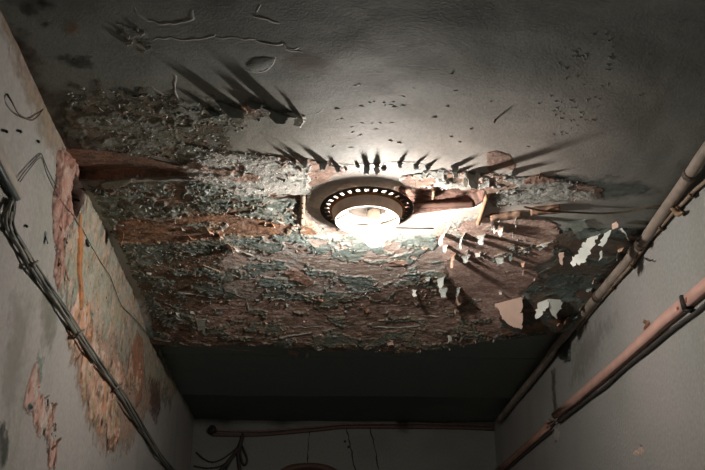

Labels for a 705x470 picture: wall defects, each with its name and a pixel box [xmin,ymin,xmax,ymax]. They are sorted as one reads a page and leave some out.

crack [152,34,303,53]
crack [252,4,280,24]
peeling [45,80,638,452]
peeling [24,363,62,470]